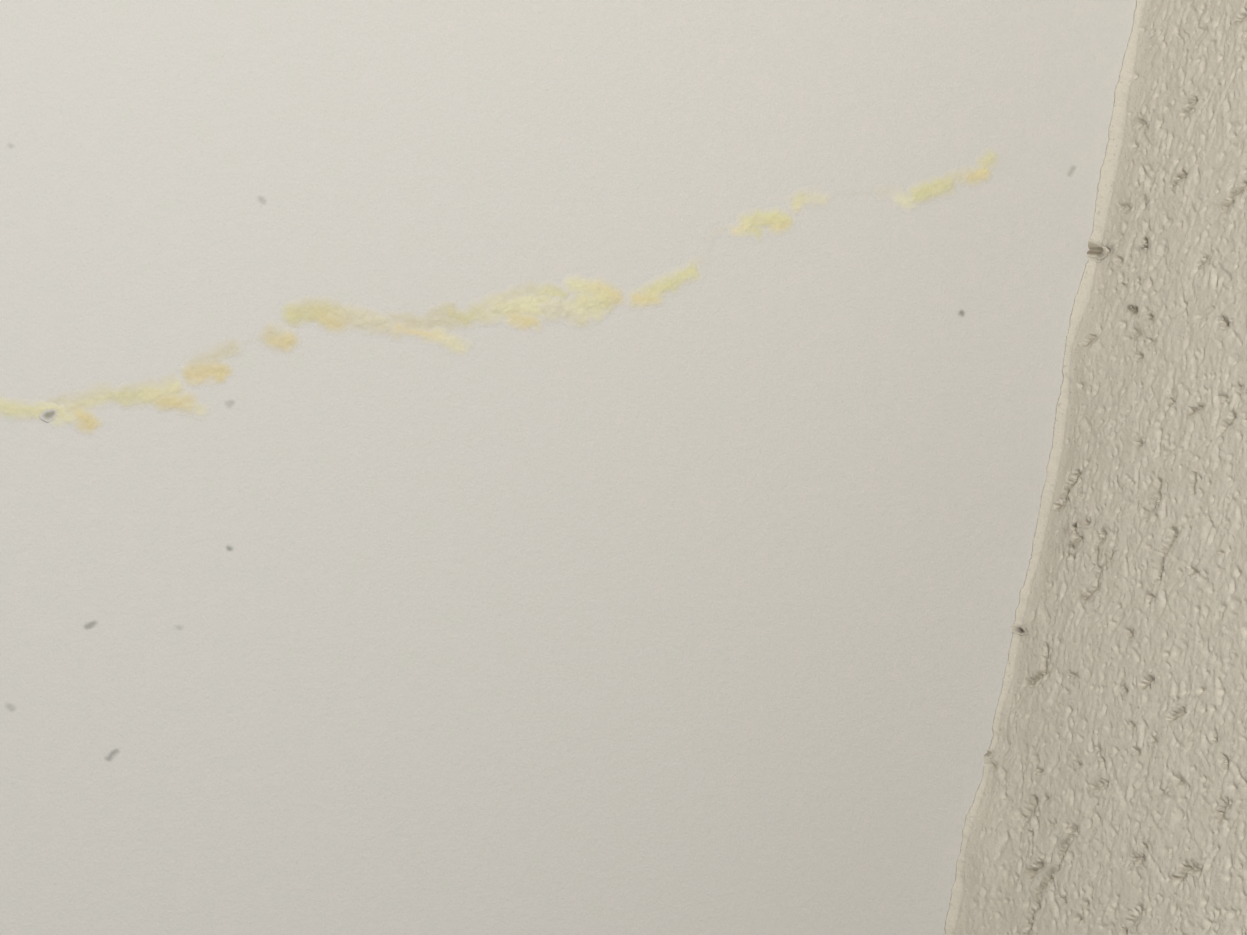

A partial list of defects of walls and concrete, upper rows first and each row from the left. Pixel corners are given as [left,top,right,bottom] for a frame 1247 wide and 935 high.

crack [0,146,1003,437]